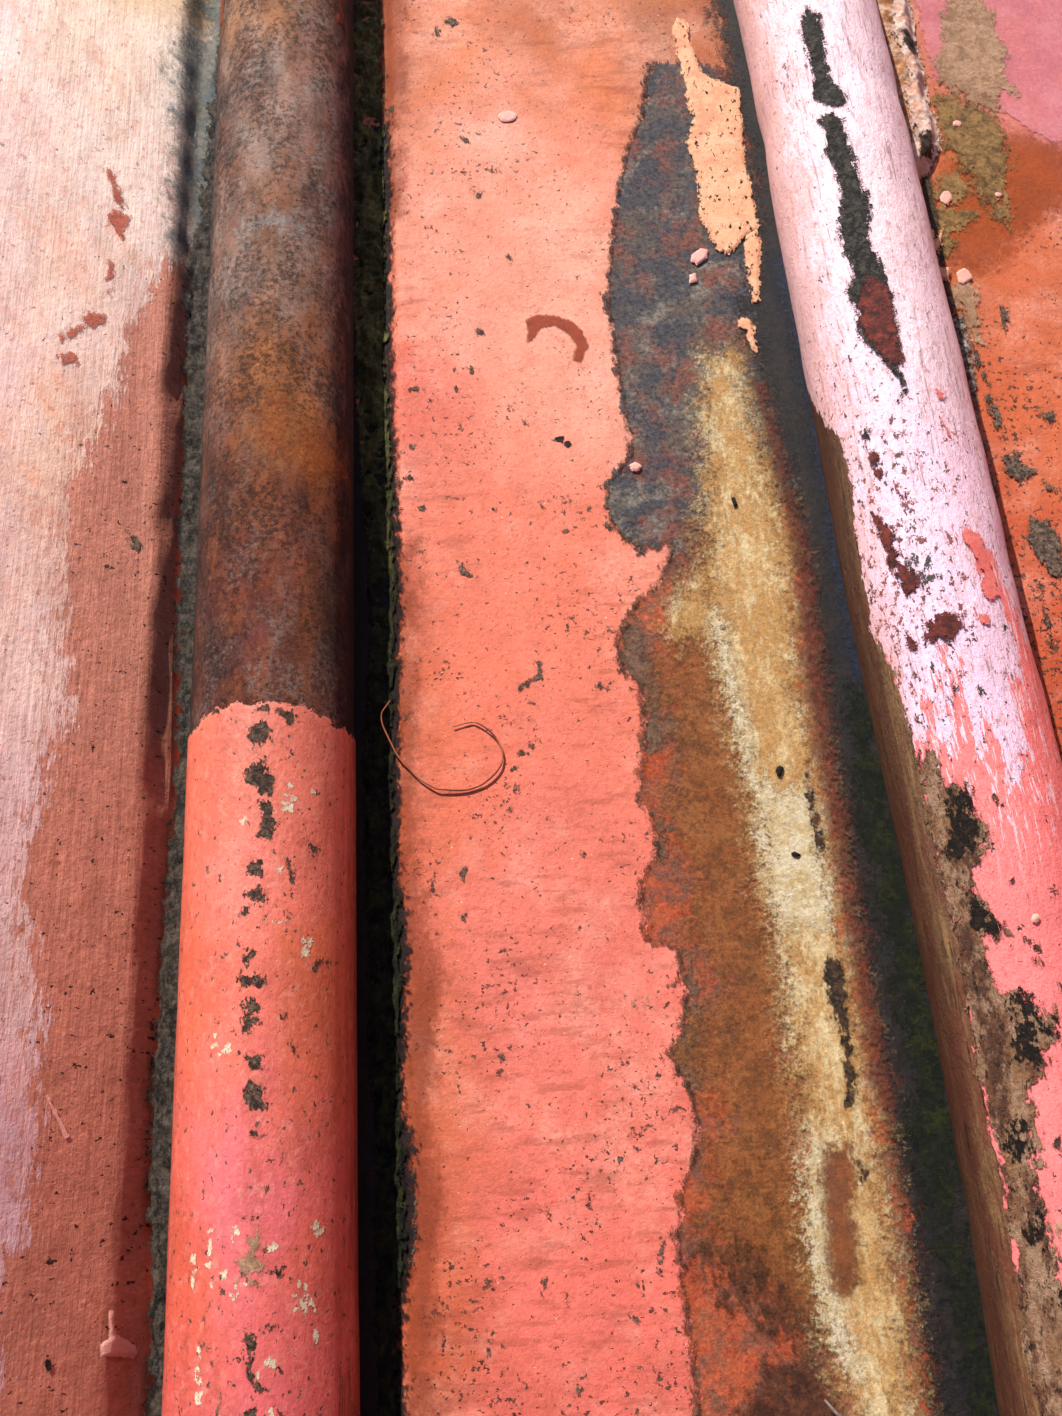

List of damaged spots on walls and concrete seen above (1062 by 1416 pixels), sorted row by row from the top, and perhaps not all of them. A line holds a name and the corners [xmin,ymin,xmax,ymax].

corrosion [234,200,310,245]
peeling [797,4,909,402]
peeling [928,0,1022,429]
peeling [238,857,271,917]
peeling [236,946,289,1112]
peeling [242,701,298,840]
water stain [355,0,422,1416]
peeling [600,17,872,1416]
corrosion [659,342,935,1416]
water stain [600,0,1000,1416]
peeling [751,427,952,1416]